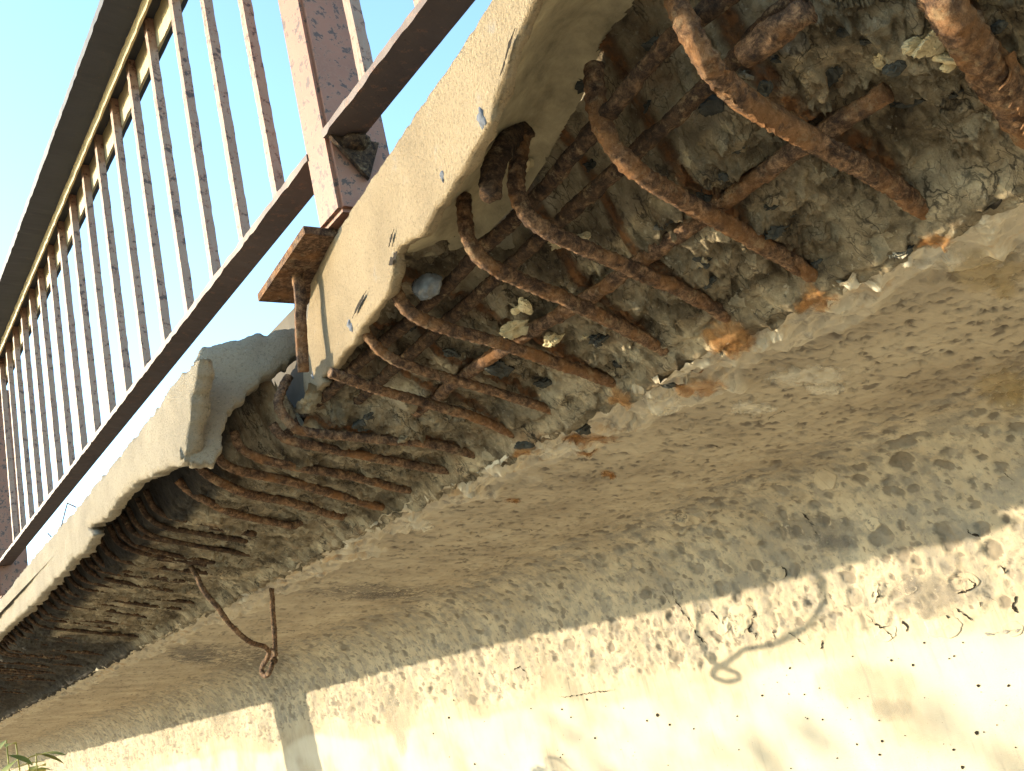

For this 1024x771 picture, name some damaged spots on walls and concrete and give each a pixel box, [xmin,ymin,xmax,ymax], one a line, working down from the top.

spalling [268,0,1024,486]
rust [919,237,950,252]
rust [795,287,834,312]
rust [703,322,755,360]
rust [566,434,614,456]
flaking render [814,469,837,491]
spalling [0,380,457,722]
flaking render [940,573,980,594]
flaking render [718,604,754,637]
flaking render [874,626,897,642]